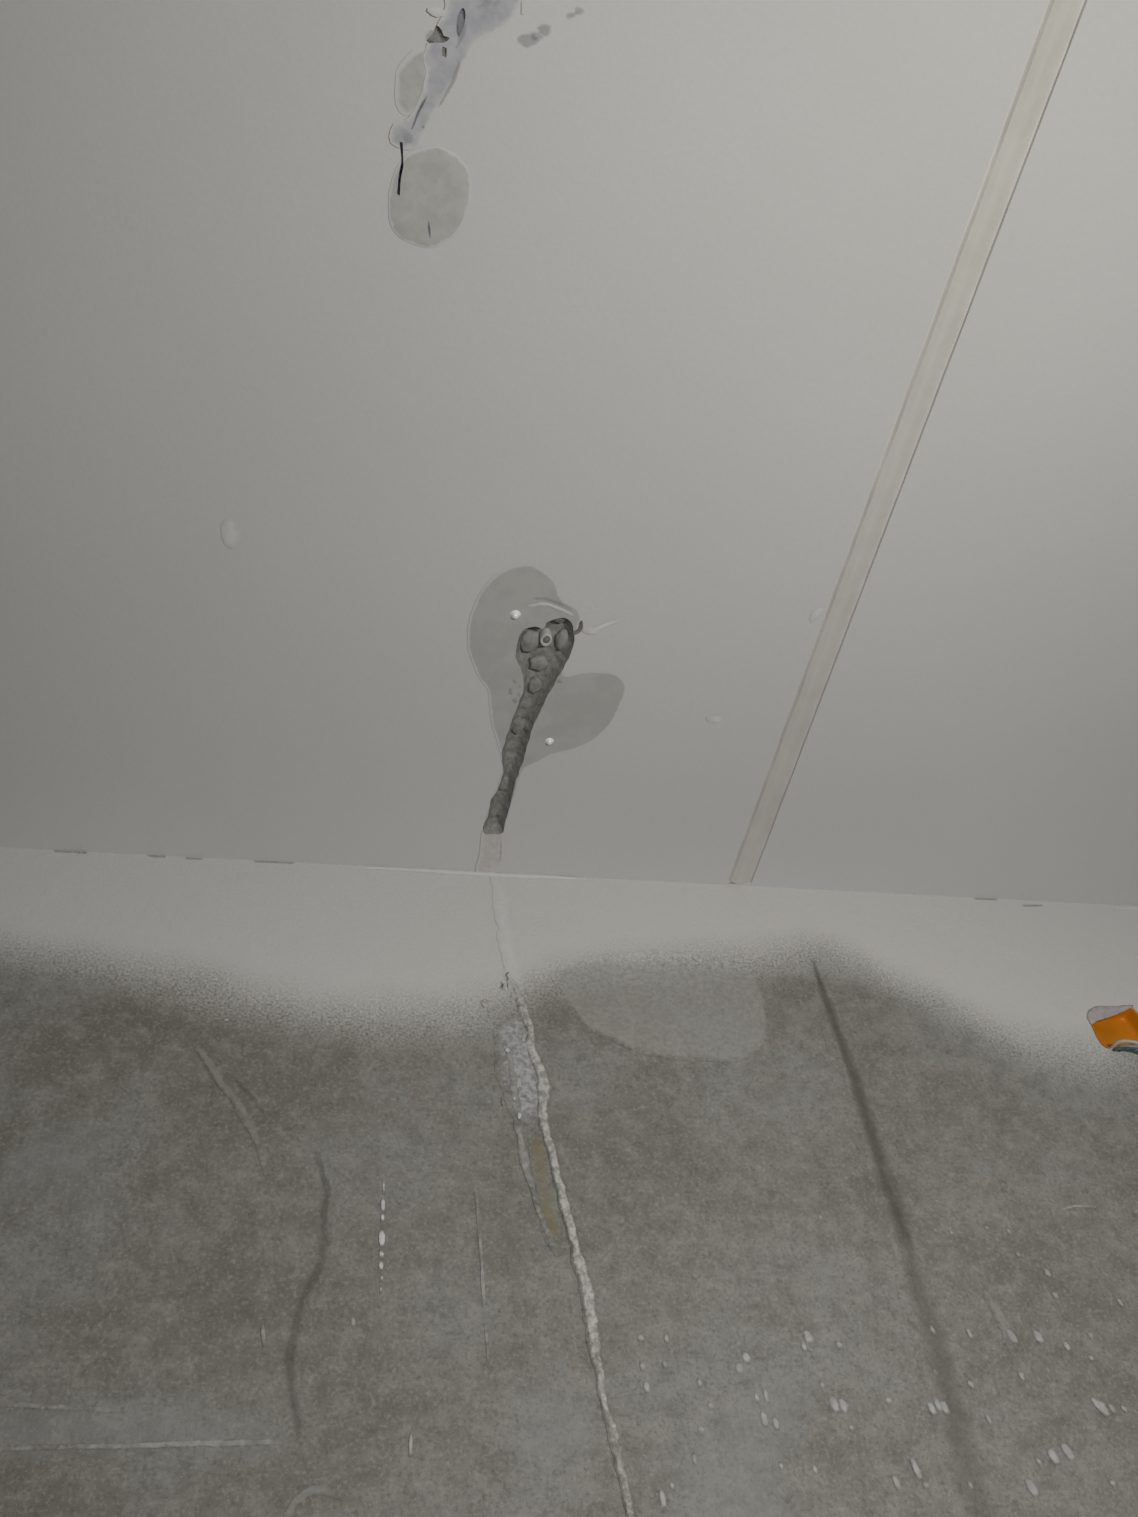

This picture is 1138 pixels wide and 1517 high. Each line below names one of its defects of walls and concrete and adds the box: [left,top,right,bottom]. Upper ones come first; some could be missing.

spalling [426,8,465,57]
spalling [476,602,624,873]
crack [481,876,637,1517]